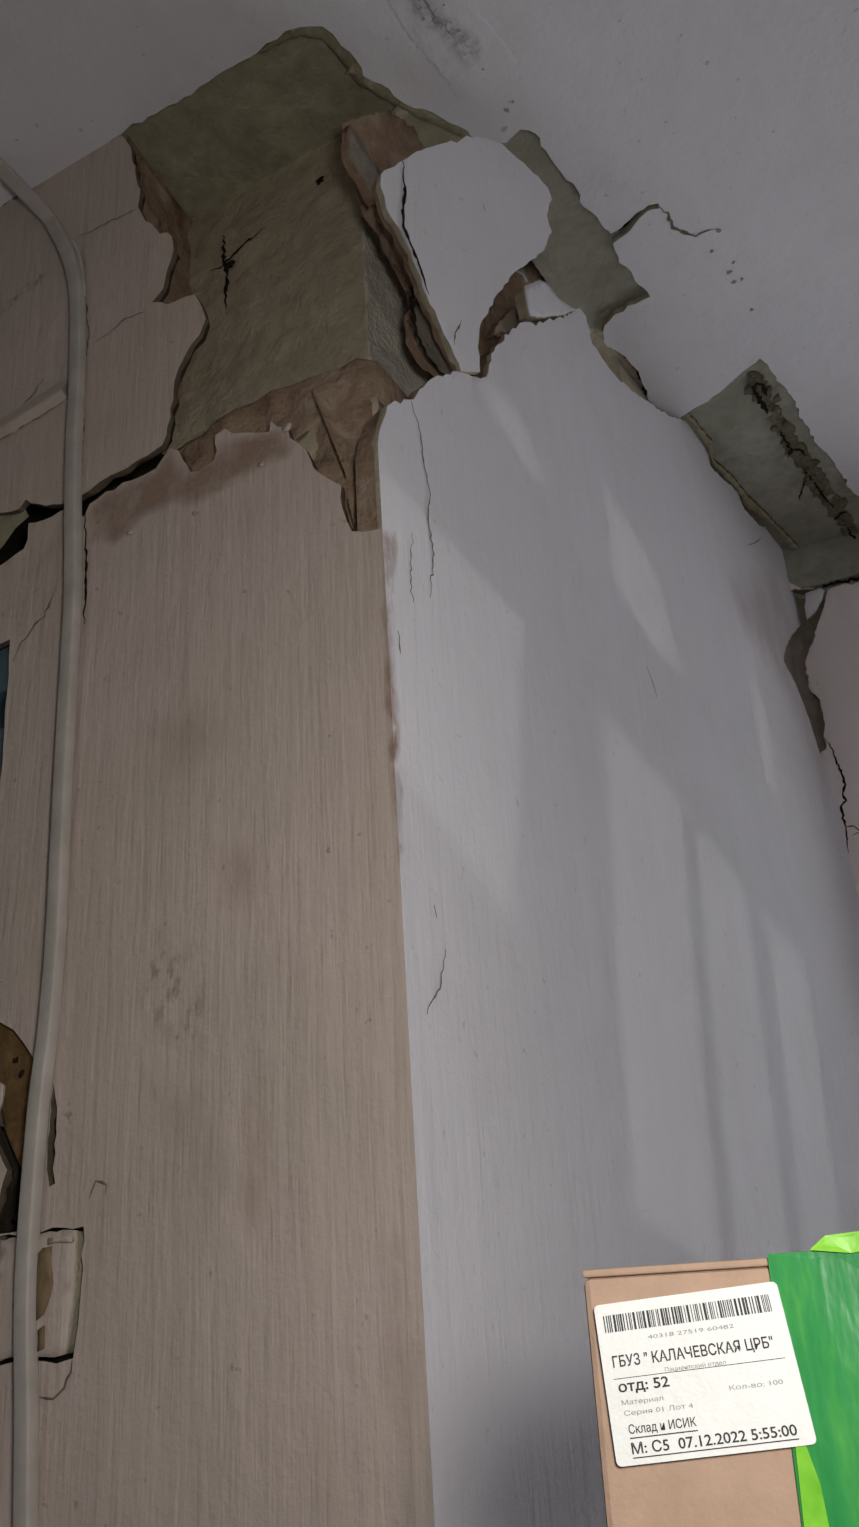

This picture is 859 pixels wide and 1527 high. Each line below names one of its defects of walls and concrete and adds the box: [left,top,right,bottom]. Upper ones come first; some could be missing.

crack [78,209,145,356]
flaking render [127,136,193,304]
flaking render [341,100,576,378]
flaking render [589,309,668,415]
spalling [162,358,407,532]
flaking render [0,509,29,549]
crack [0,408,165,661]
flaking render [794,577,859,600]
crack [784,588,859,853]
peeling [0,1056,25,1112]
peeling [36,1246,53,1352]